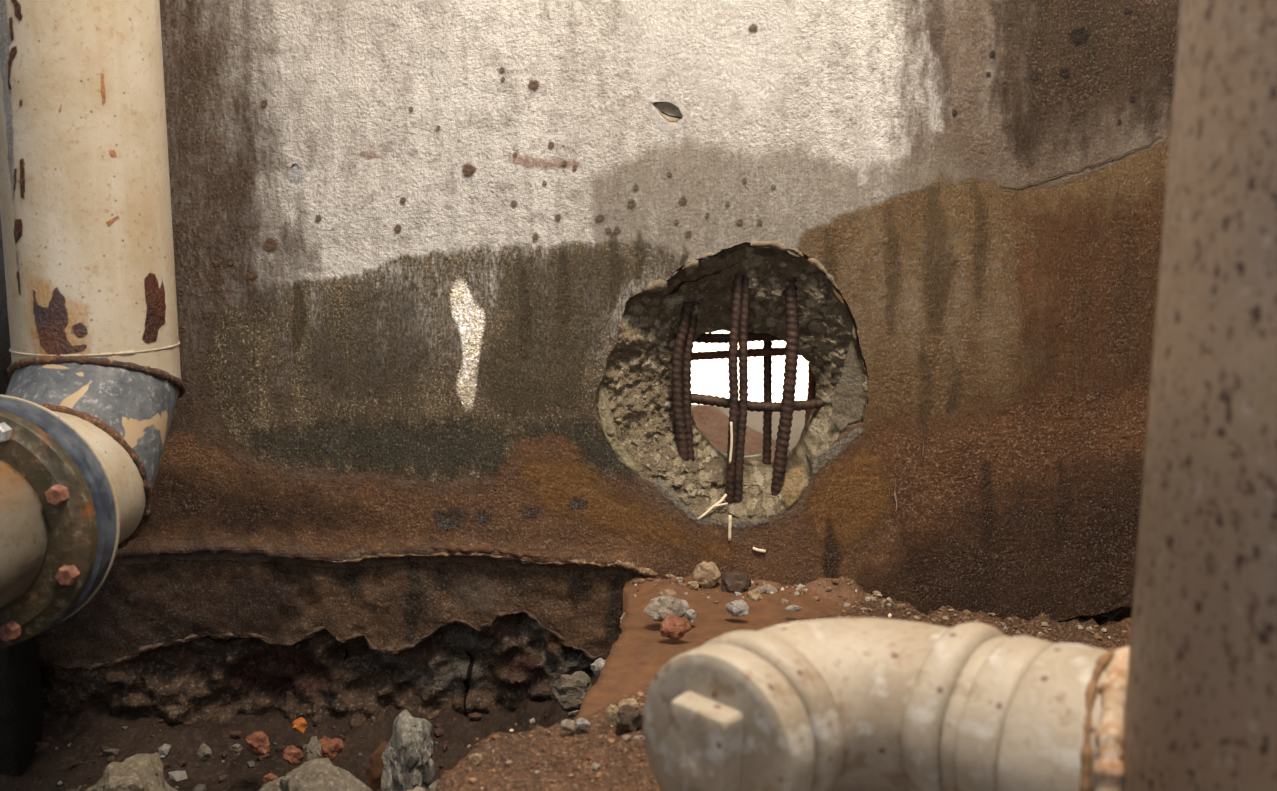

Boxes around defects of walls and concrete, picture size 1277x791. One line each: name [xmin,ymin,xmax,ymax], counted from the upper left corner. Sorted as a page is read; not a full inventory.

corrosion [513,142,579,186]
corrosion [595,214,621,234]
leakage [159,0,1181,484]
spalling [594,241,869,528]
spalling [39,610,607,728]
leakage [37,559,623,669]